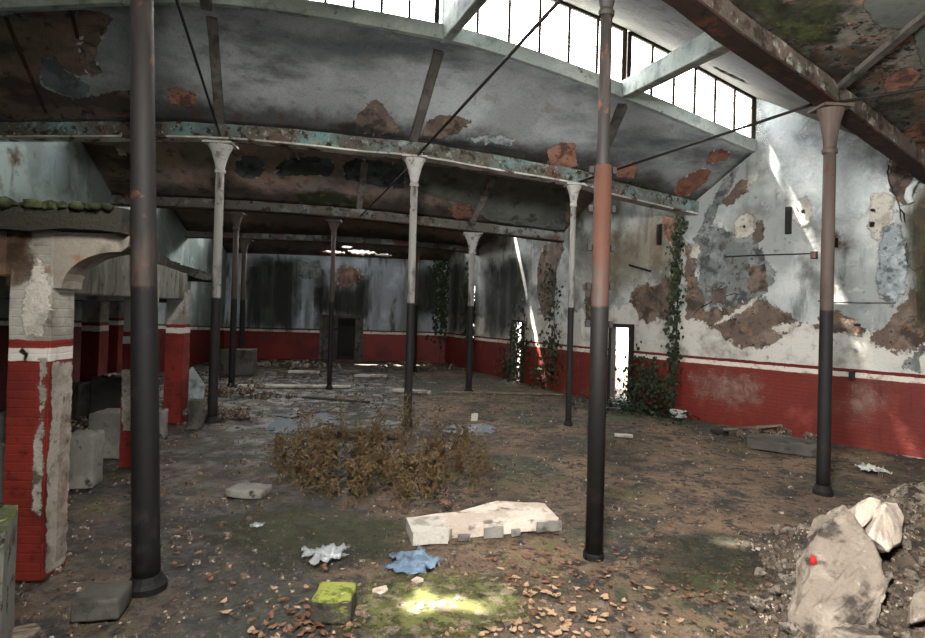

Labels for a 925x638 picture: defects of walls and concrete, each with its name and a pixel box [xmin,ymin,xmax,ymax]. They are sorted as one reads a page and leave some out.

peeling [355,100,399,137]
peeling [423,115,516,147]
peeling [545,142,579,168]
peeling [674,149,730,198]
peeling [889,162,920,206]
water stain [246,257,301,332]
water stain [315,275,371,328]
peeling [537,242,565,315]
peeling [629,167,802,350]
peeling [833,222,925,356]
water stain [905,192,925,324]
spalling [31,358,73,574]